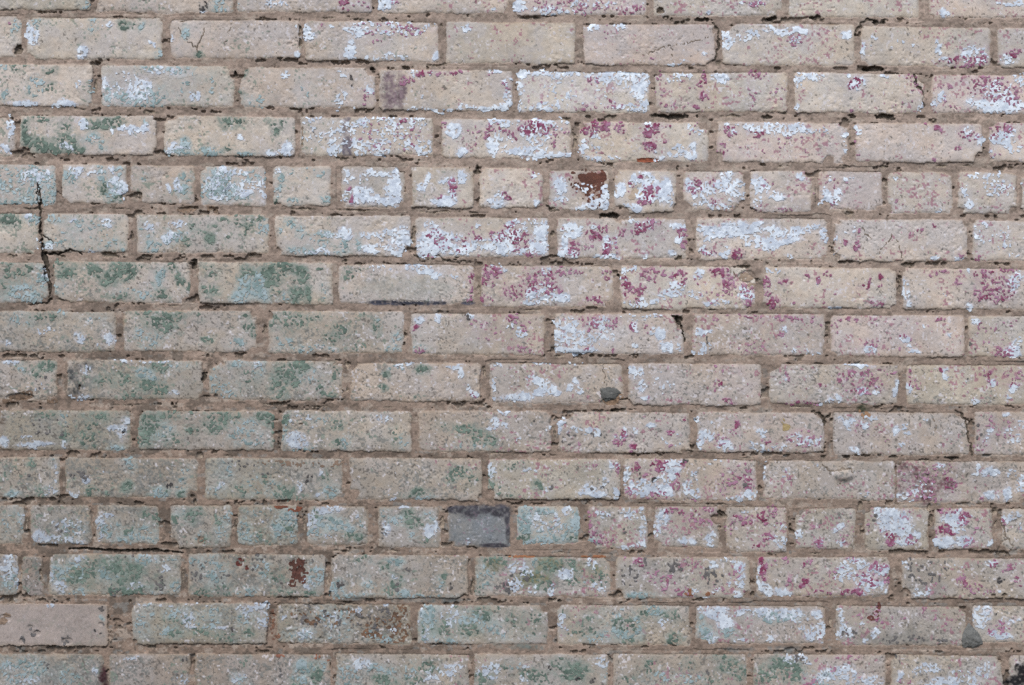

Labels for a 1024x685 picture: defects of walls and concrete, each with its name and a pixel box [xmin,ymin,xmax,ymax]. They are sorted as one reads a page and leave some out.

peeling [294,0,435,61]
peeling [400,51,463,86]
peeling [895,39,1024,159]
crack [34,183,83,305]
peeling [0,19,348,491]
peeling [139,57,884,448]
peeling [929,222,1024,358]
peeling [960,171,1023,209]
peeling [516,416,906,685]
peeling [866,463,979,549]
peeling [954,564,1021,640]
peeling [971,413,1024,530]